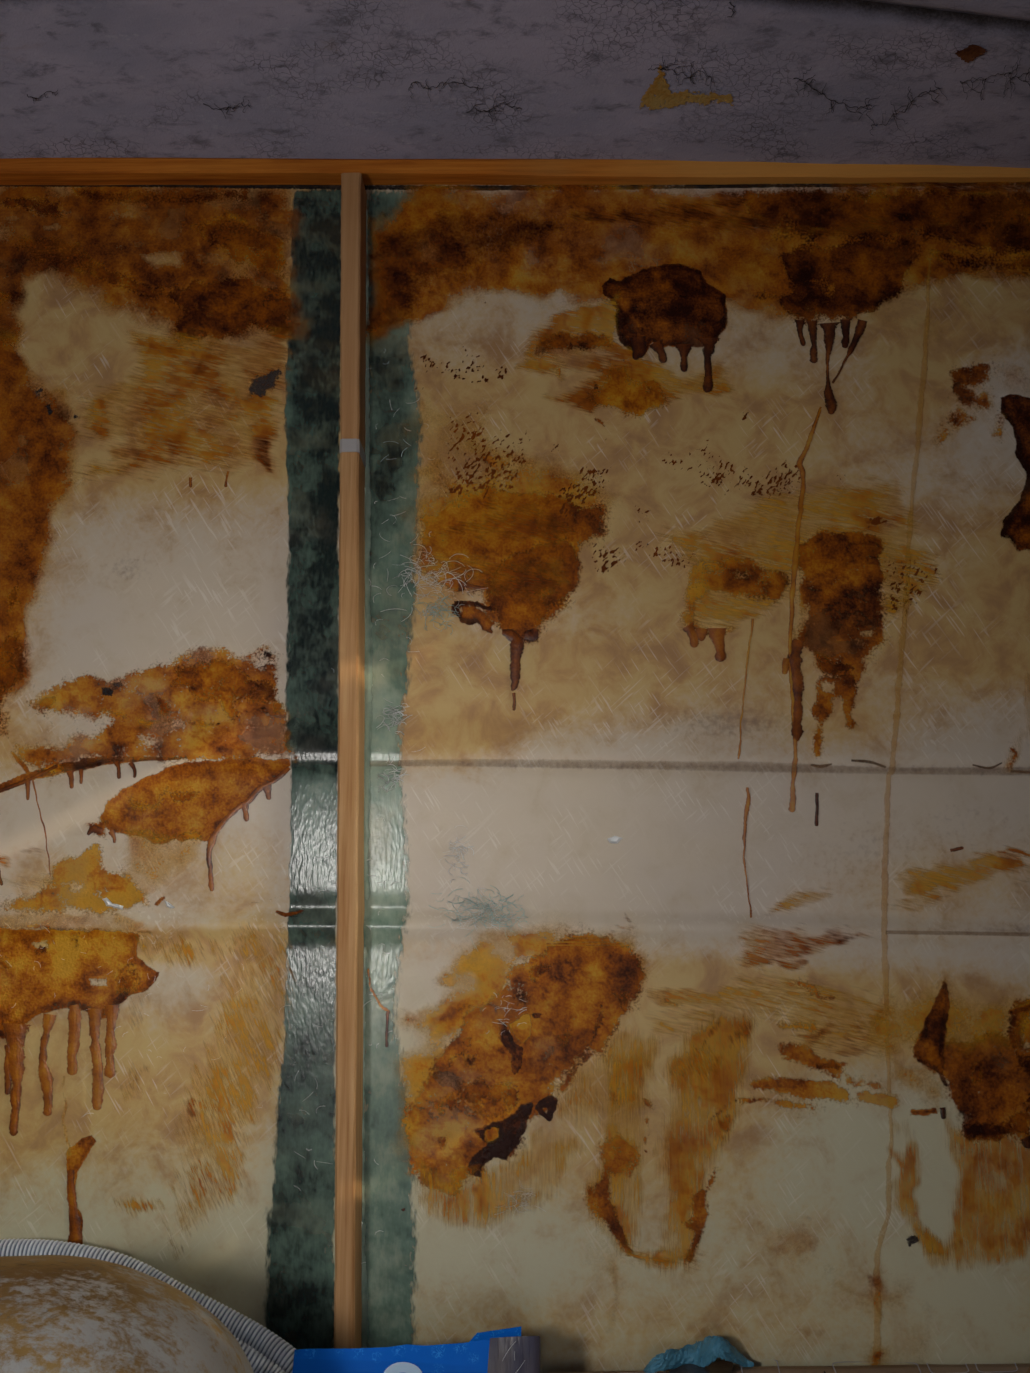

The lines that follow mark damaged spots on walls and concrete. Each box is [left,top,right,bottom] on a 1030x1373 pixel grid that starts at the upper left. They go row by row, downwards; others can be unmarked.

peeling [639,63,733,110]
corrosion [366,182,1030,426]
corrosion [0,186,300,1136]
corrosion [418,450,607,711]
corrosion [673,485,938,757]
corrosion [938,363,1030,551]
corrosion [402,930,1030,1268]